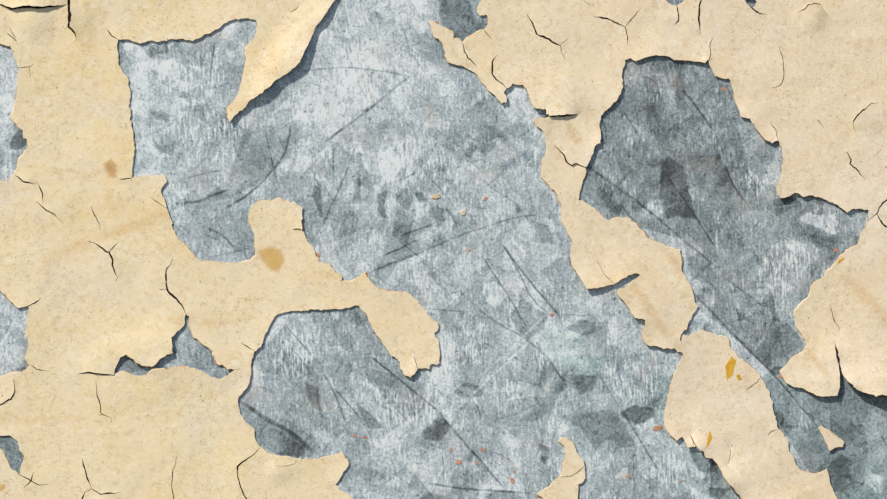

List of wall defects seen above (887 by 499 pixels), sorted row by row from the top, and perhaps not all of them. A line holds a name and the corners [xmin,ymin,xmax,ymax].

crack [588,4,638,42]
peeling [0,29,43,200]
crack [88,207,117,276]
peeling [108,0,798,499]
peeling [556,36,887,499]
peeling [0,292,43,376]
peeling [79,261,236,392]
peeling [0,435,46,488]
peeling [80,460,120,499]